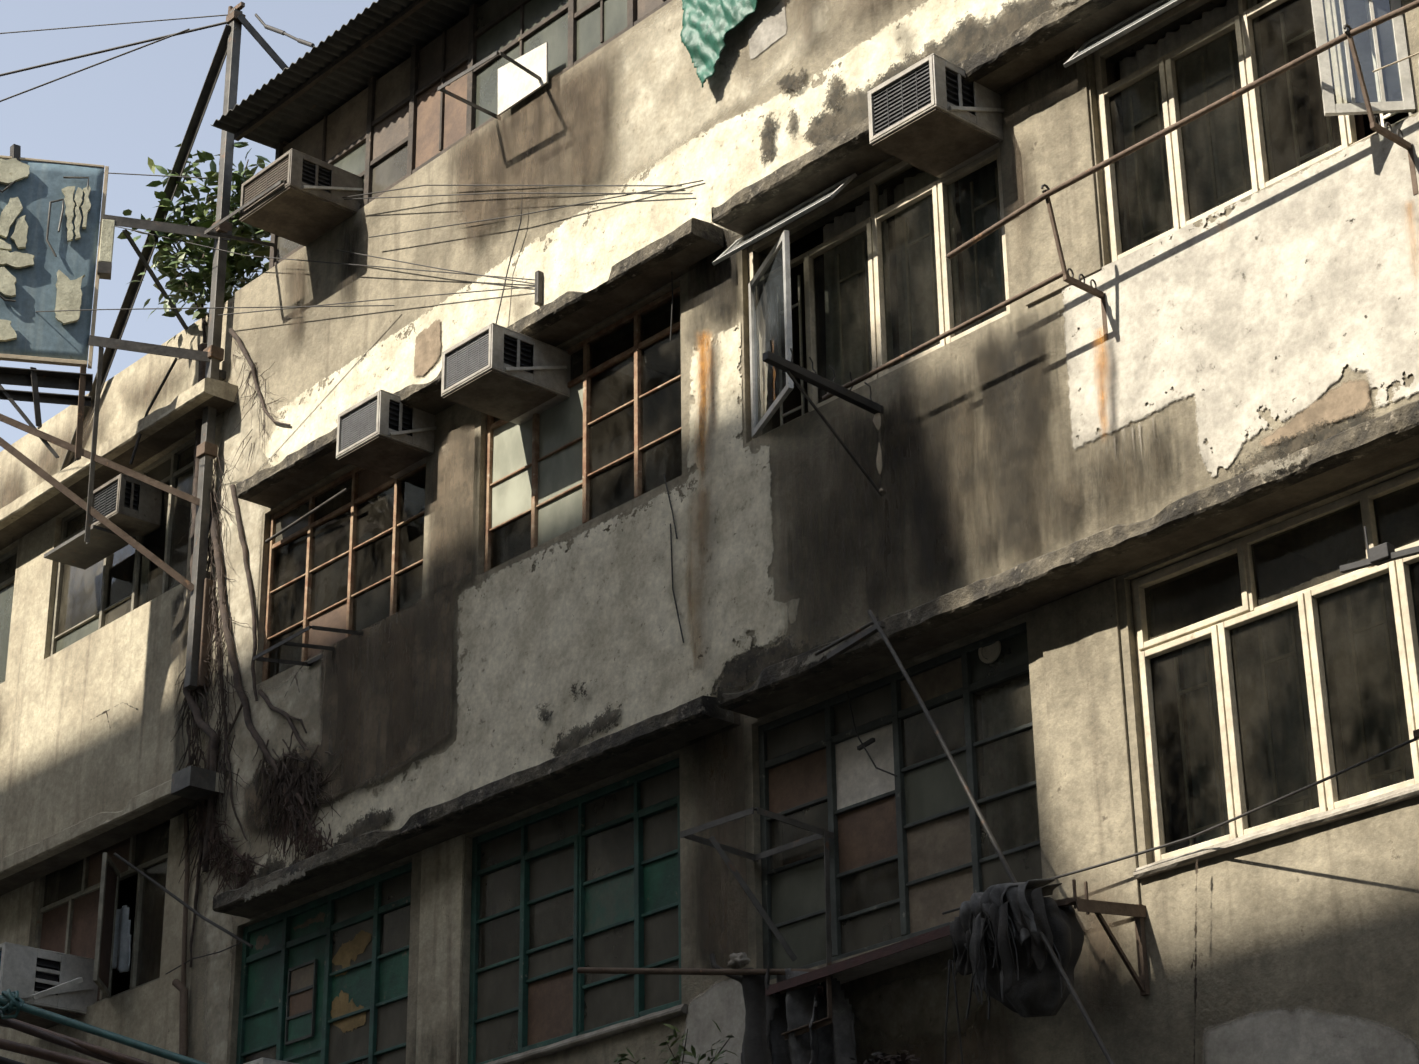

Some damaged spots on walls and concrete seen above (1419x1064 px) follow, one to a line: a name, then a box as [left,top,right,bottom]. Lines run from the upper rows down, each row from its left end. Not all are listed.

damp [758,0,1067,165]
damp [1055,47,1076,77]
peeling [204,0,1018,1064]
rust [697,334,709,462]
damp [710,325,1170,696]
peeling [1062,112,1419,479]